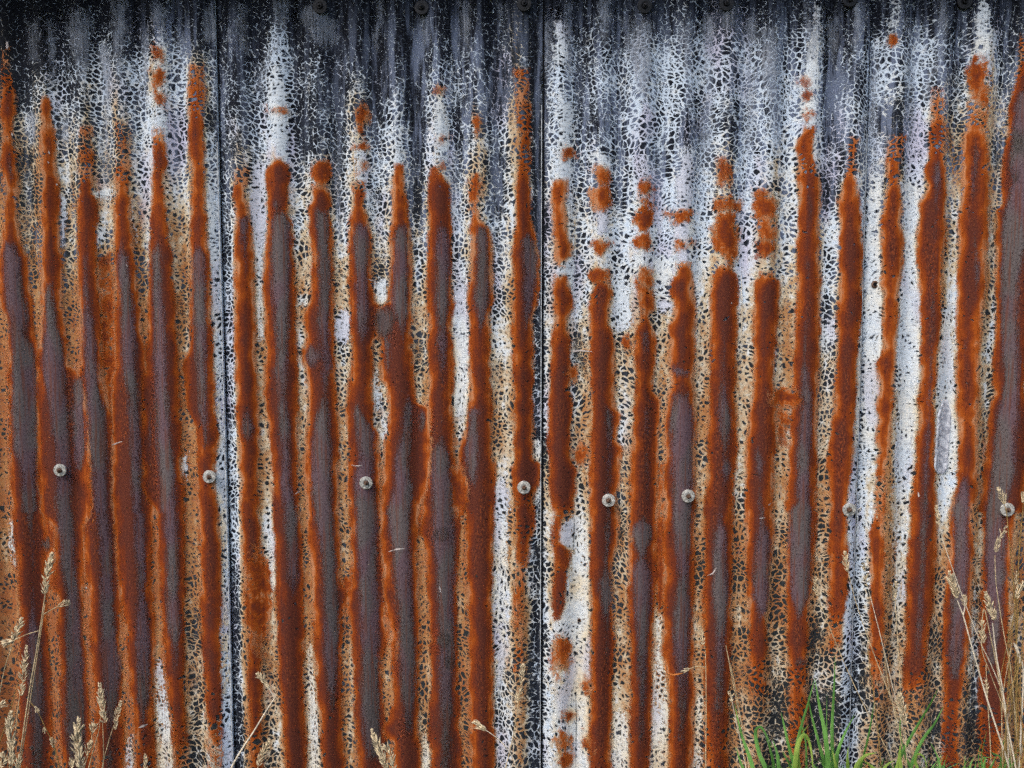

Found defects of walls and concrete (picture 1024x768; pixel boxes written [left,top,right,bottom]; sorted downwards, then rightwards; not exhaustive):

rust [0,46,224,768]
crack [116,515,163,678]
crack [250,247,270,290]
crack [243,308,279,378]
crack [249,385,282,575]
crack [292,364,313,522]
rust [232,104,497,768]
crack [356,322,403,492]
crack [336,534,443,768]
crack [451,509,481,768]
rust [510,69,864,768]
rust [867,38,1024,768]